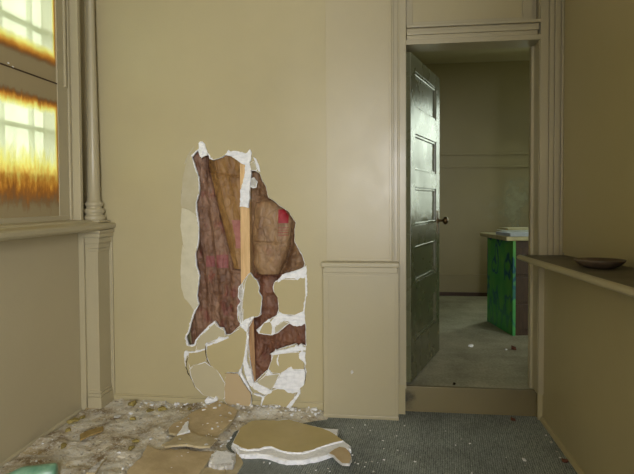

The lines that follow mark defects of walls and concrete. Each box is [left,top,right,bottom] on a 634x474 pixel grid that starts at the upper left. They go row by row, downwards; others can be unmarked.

spalling [180,141,307,408]